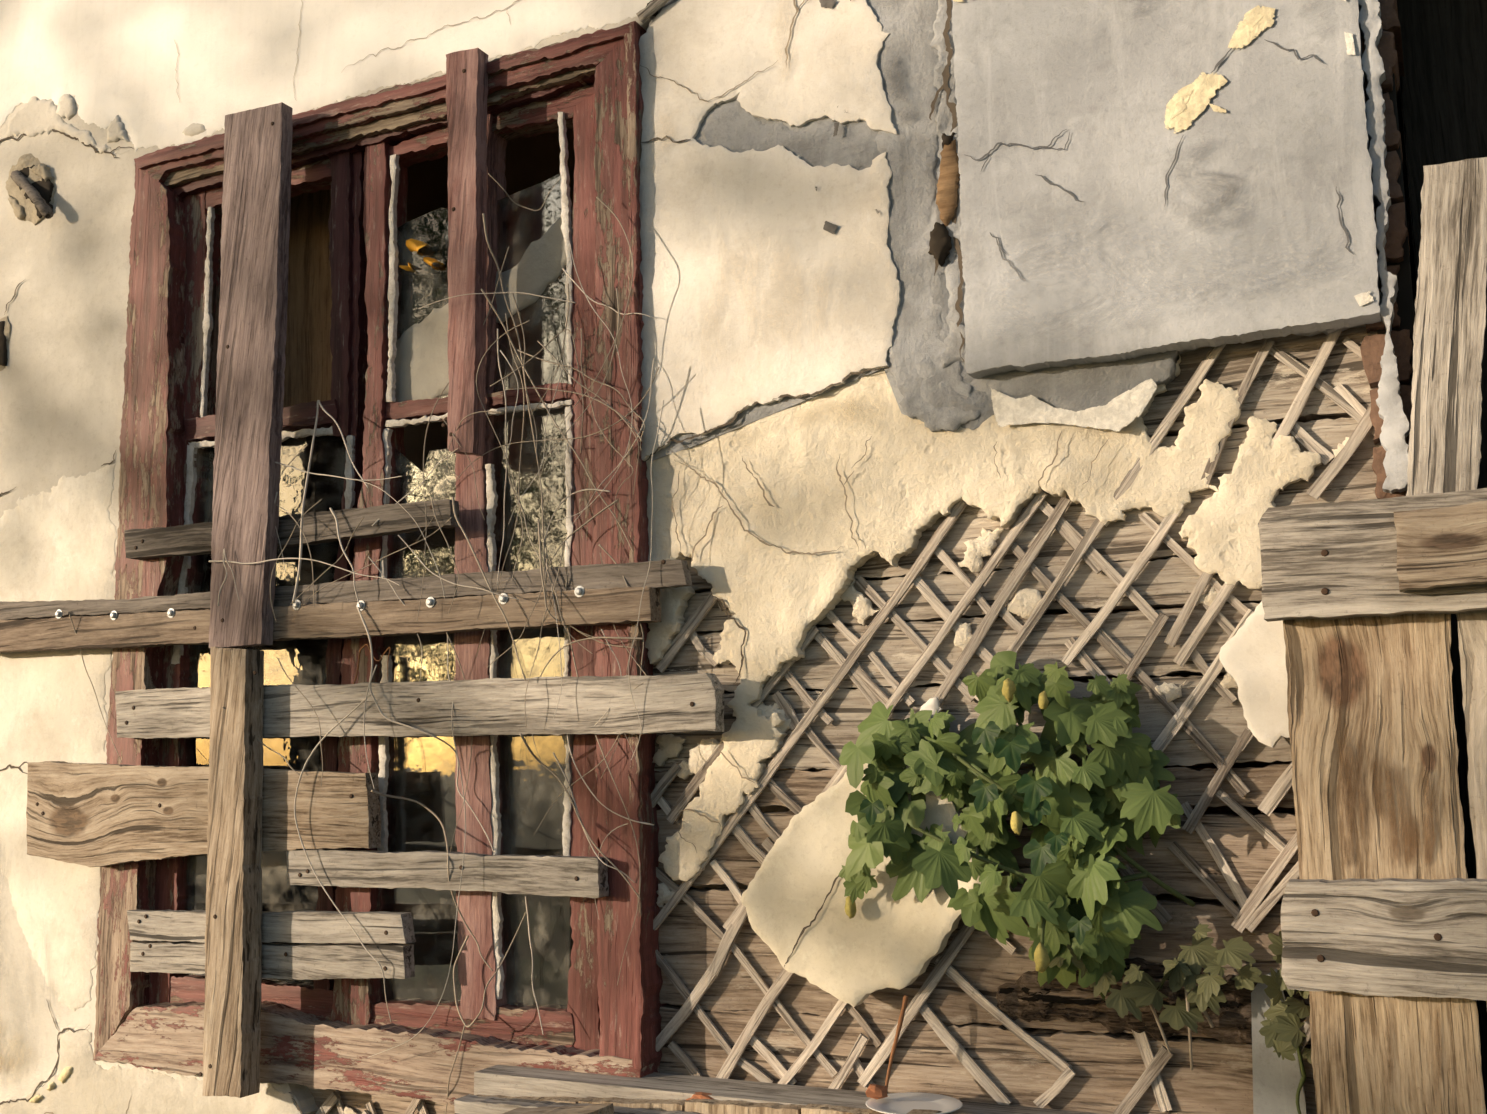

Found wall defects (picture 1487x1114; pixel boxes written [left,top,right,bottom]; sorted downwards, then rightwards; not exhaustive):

peeling [646,0,678,19]
crack [1211,39,1323,73]
crack [0,129,135,158]
peeling [6,94,130,225]
crack [1164,136,1183,207]
peeling [697,0,1157,432]
crack [1336,186,1354,255]
spalling [0,316,11,371]
crack [643,366,887,562]
crack [711,594,746,685]
crack [0,762,28,774]
crack [0,999,91,1114]